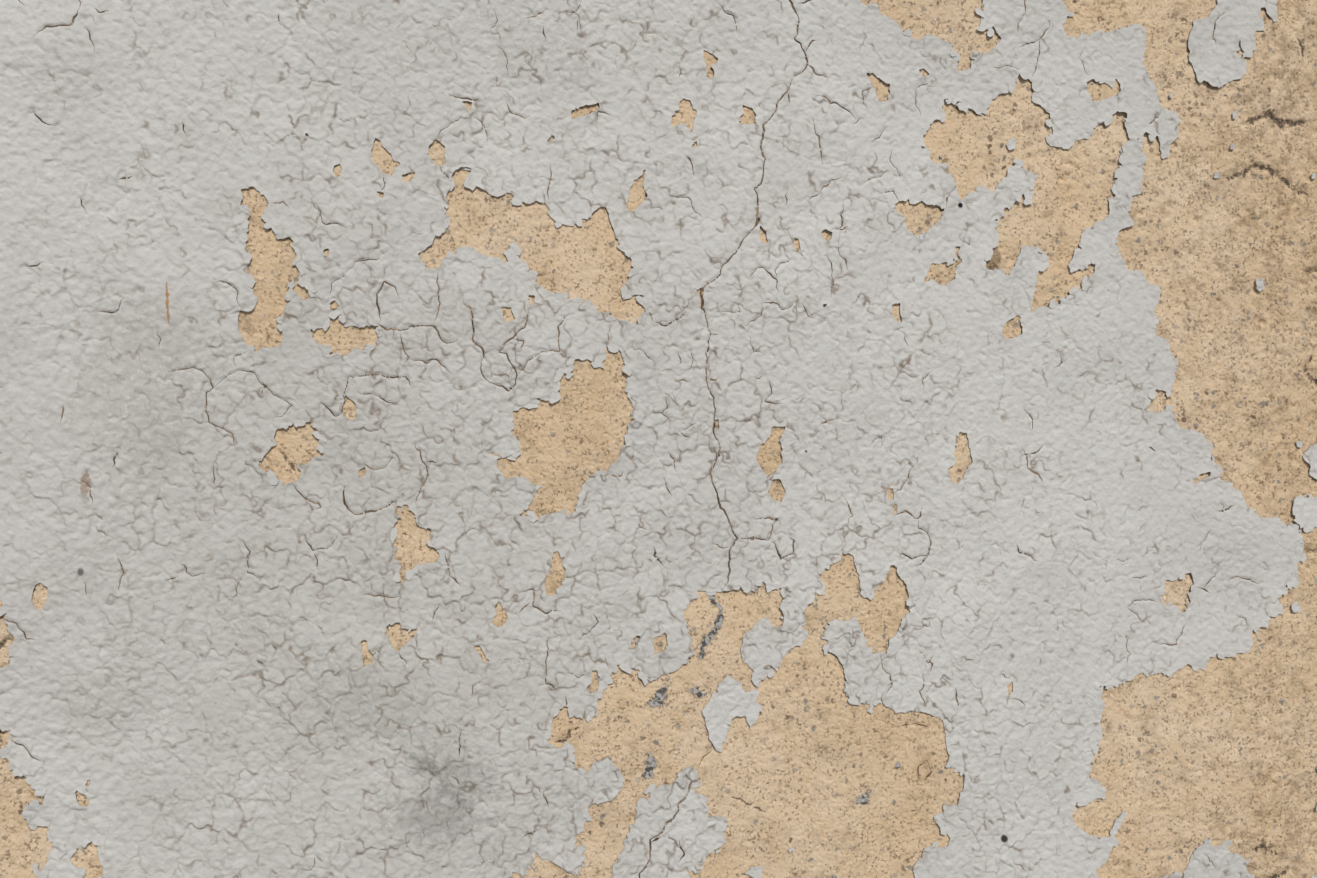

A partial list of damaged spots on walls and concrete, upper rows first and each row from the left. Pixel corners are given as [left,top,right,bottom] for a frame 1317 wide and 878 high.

crack [18,0,109,46]
peeling [861,0,1001,71]
peeling [238,187,316,352]
crack [282,445,436,567]
crack [157,247,574,488]
peeling [418,137,648,324]
peeling [493,343,634,523]
crack [608,0,904,589]
peeling [919,0,1317,878]
crack [519,588,609,743]
peeling [512,551,965,878]
crack [639,751,711,878]